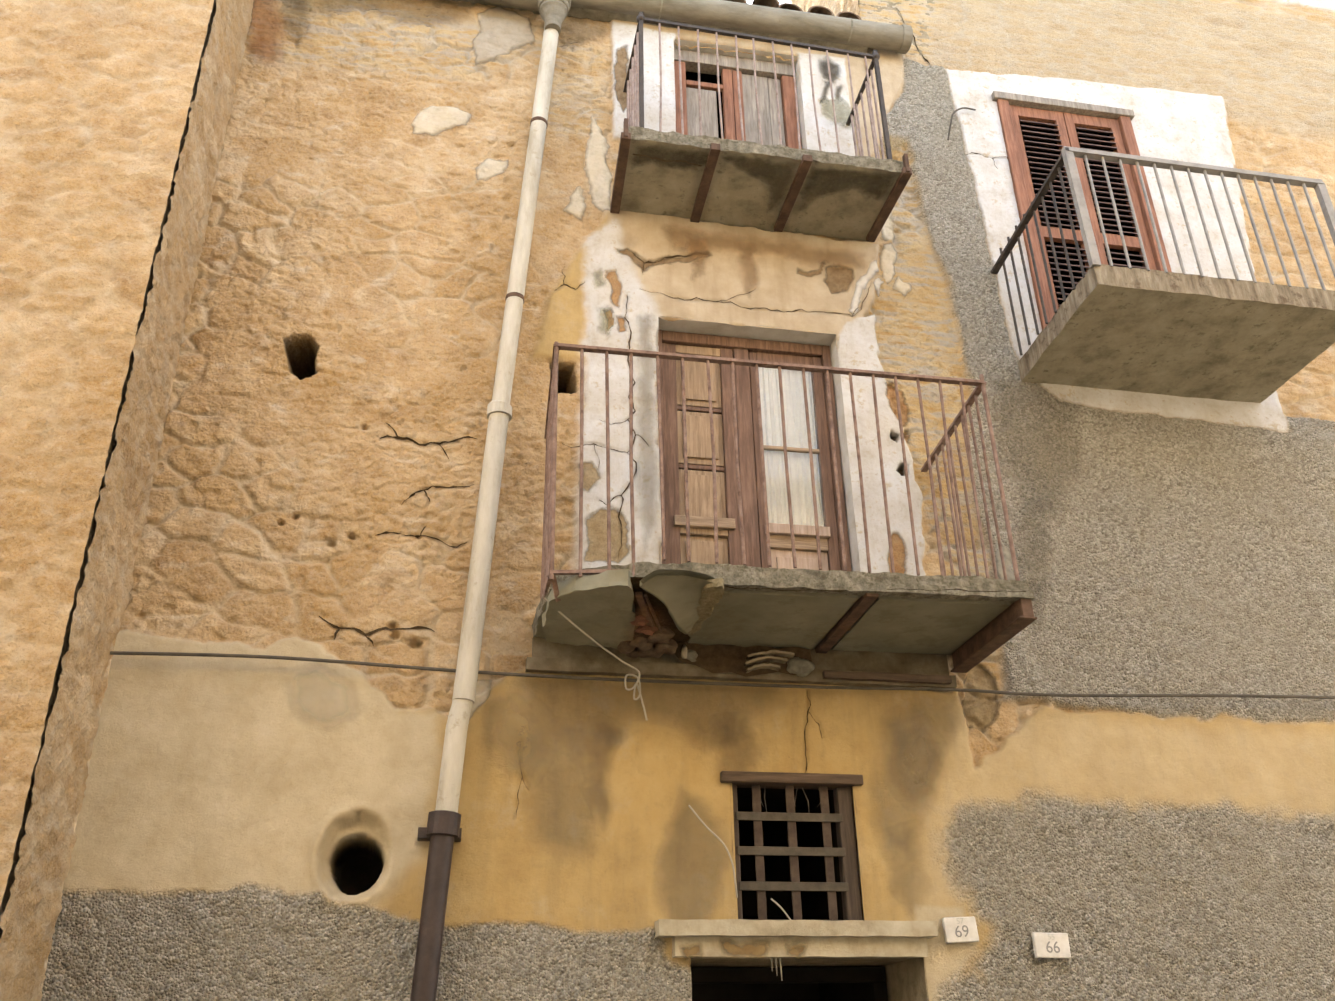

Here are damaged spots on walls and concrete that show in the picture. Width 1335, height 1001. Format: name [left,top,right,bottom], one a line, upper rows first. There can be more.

water stain [634,147,708,169]
water stain [725,157,792,210]
water stain [802,169,893,207]
crack [563,252,870,557]
crack [377,423,476,548]
flaking render [579,462,600,491]
flaking render [584,509,629,563]
spalling [630,569,815,677]
crack [804,698,822,773]